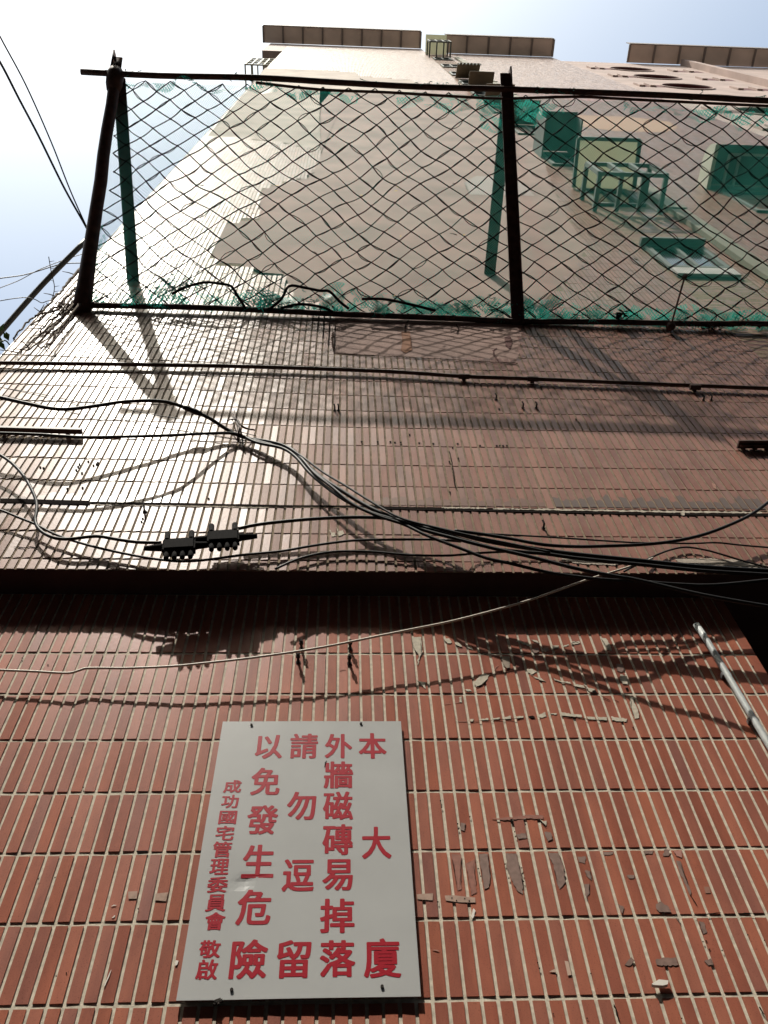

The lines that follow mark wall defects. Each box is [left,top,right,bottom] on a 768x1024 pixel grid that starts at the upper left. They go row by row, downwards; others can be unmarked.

peeling [412,637,423,665]
peeling [459,674,490,703]
peeling [527,669,595,692]
peeling [539,674,639,728]
peeling [651,979,668,988]